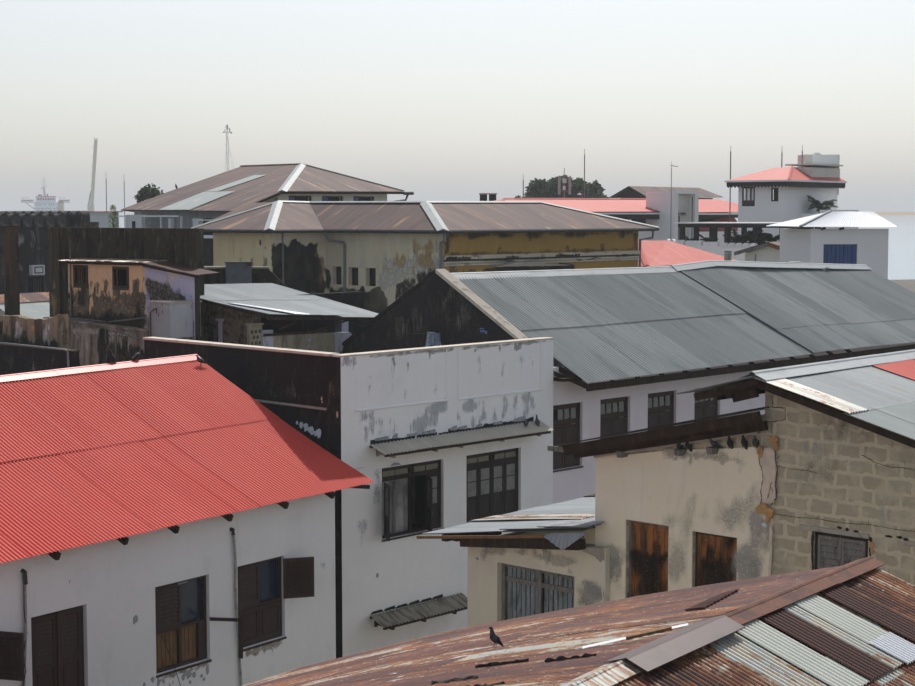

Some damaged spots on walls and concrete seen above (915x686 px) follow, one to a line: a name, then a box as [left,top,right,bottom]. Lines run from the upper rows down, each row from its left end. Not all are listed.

damp [0,279,59,359]
damp [67,278,185,364]
damp [251,239,436,326]
flaking render [370,416,534,445]
flaking render [757,435,779,504]
crack [758,399,915,532]
damp [724,503,770,580]
rust [626,626,672,639]
rust [782,604,904,670]